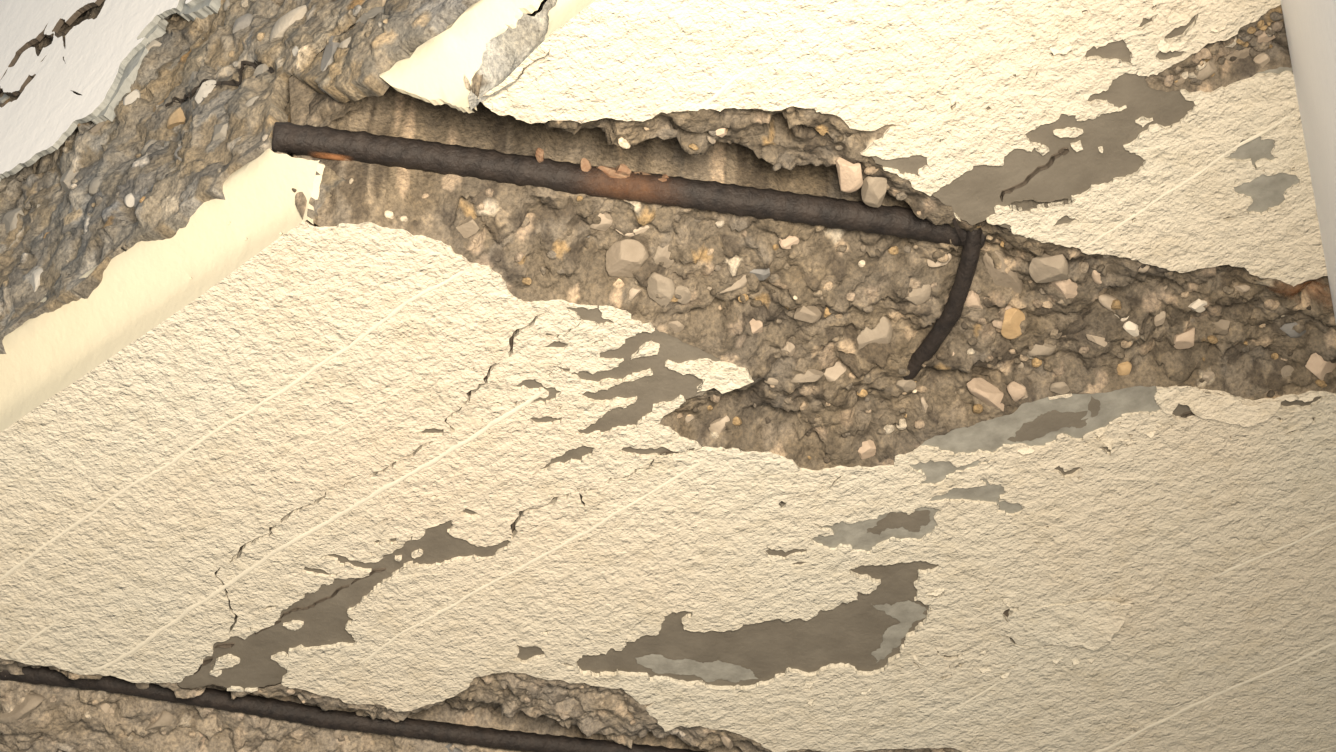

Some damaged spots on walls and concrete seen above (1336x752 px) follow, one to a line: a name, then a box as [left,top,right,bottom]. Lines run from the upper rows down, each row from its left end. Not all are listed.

crack [0,90,20,108]
crack [31,0,106,53]
spalling [0,0,1336,565]
crack [371,315,539,475]
crack [511,446,702,534]
crack [193,494,386,675]
spalling [0,520,945,752]
peeling [1003,590,1019,617]